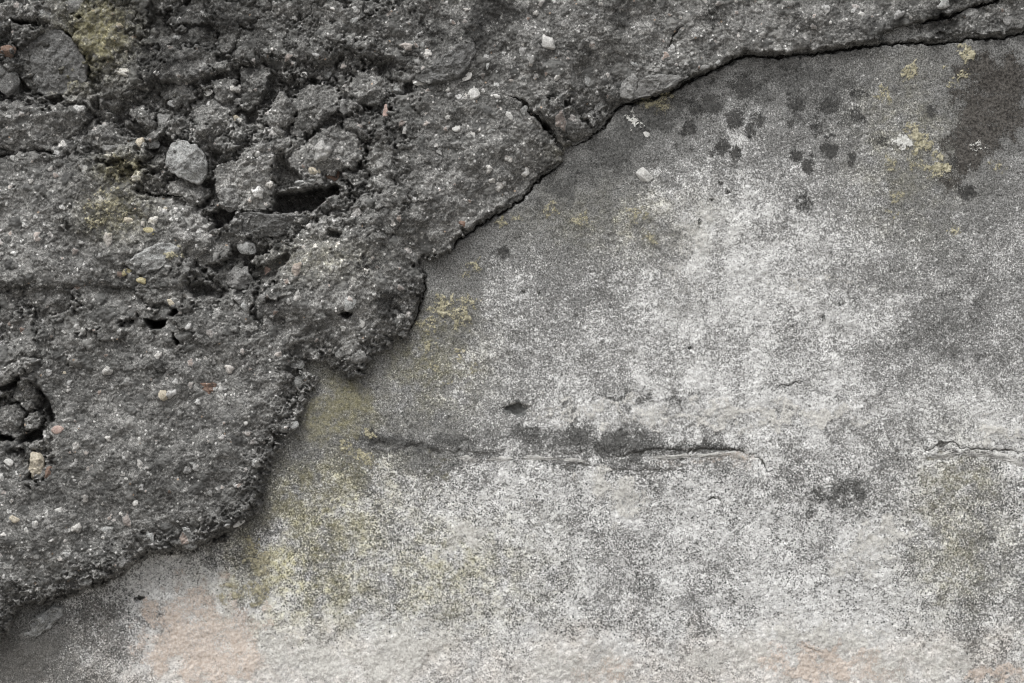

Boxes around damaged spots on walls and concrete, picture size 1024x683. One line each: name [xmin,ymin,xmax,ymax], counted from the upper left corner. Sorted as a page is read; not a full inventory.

spalling [908,0,1024,42]
spalling [0,10,422,303]
spalling [532,83,621,145]
leakage [535,54,868,212]
crack [454,0,1024,248]
leakage [934,50,1024,201]
spalling [0,372,64,490]
spalling [253,338,319,496]
crack [363,442,500,455]
peeling [501,399,530,417]
crack [541,448,770,473]
crack [922,440,1024,453]